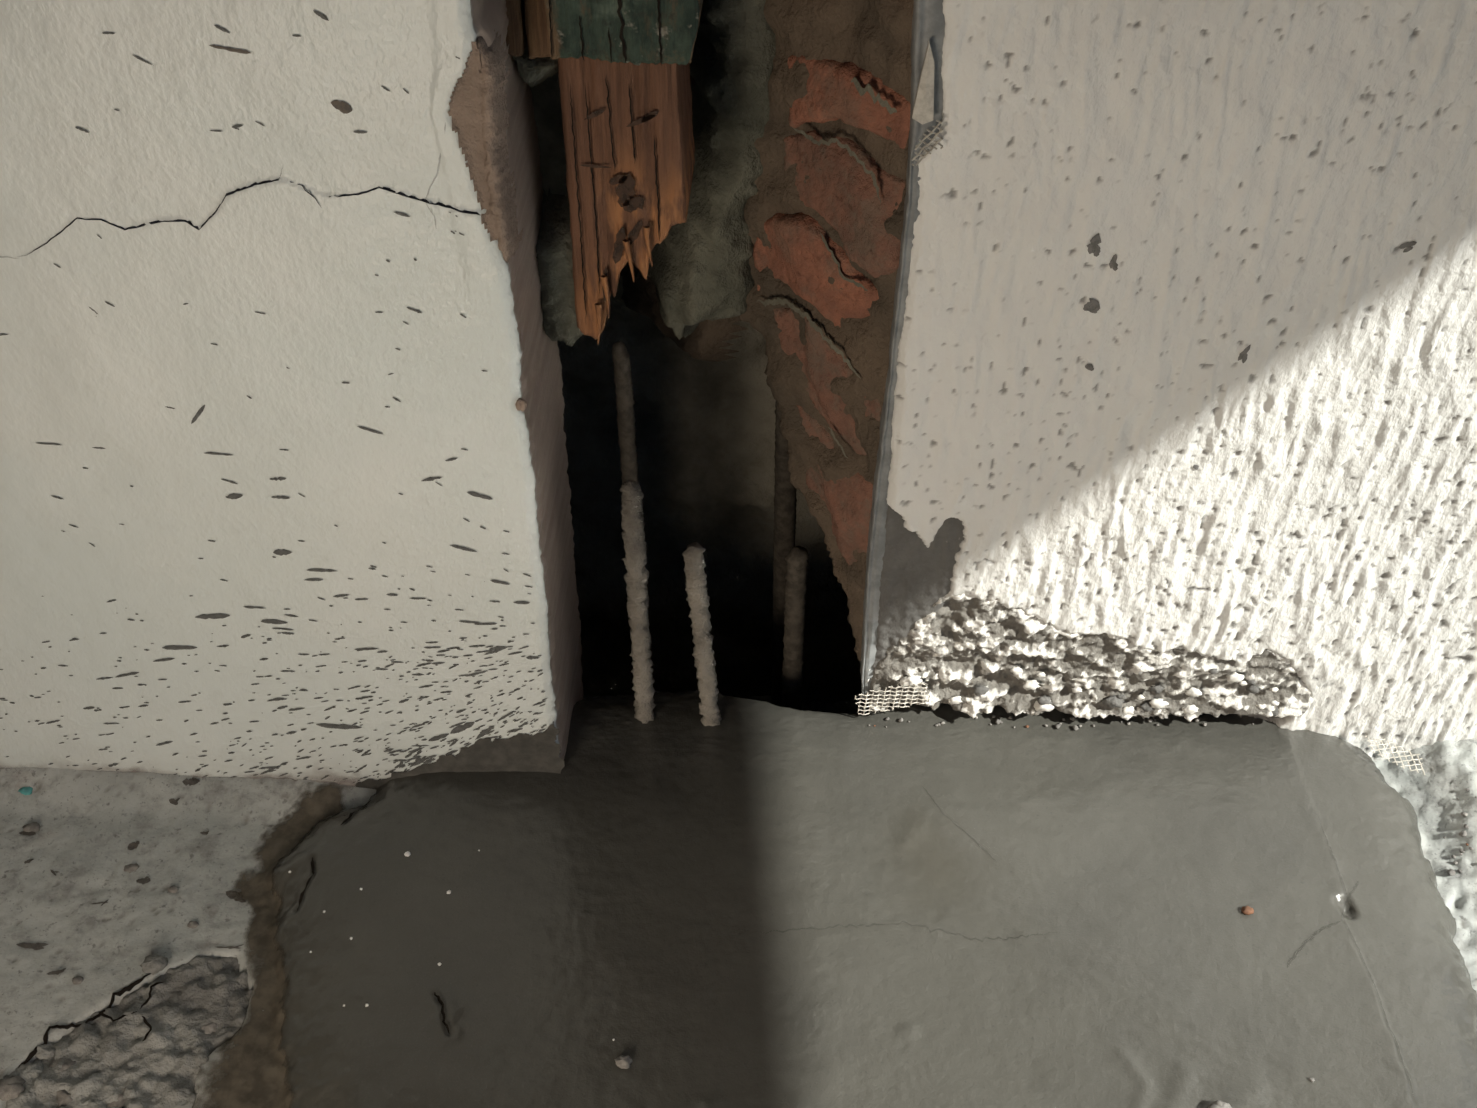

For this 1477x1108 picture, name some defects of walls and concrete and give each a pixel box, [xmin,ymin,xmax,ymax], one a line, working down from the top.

crack [19,167,480,257]
flaking render [447,30,523,263]
flaking render [515,398,527,412]
spalling [612,341,656,724]
spalling [682,542,722,726]
spalling [771,401,809,710]
flaking render [864,505,1313,722]
spalling [0,955,254,1108]